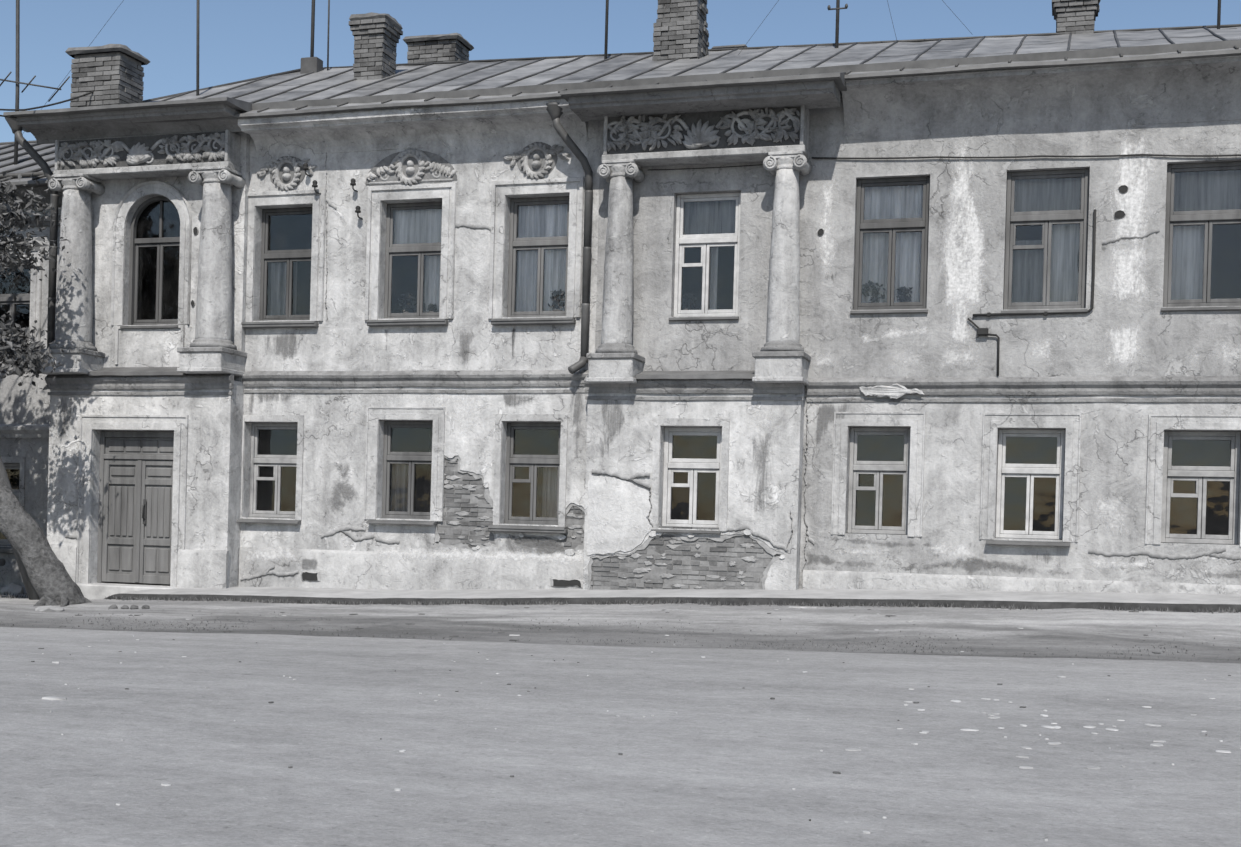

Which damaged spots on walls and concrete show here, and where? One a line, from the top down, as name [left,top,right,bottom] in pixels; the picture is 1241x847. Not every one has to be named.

crack [1102,228,1160,245]
crack [592,469,653,527]
spalling [433,453,785,590]
crack [321,525,400,544]
crack [1088,547,1241,560]